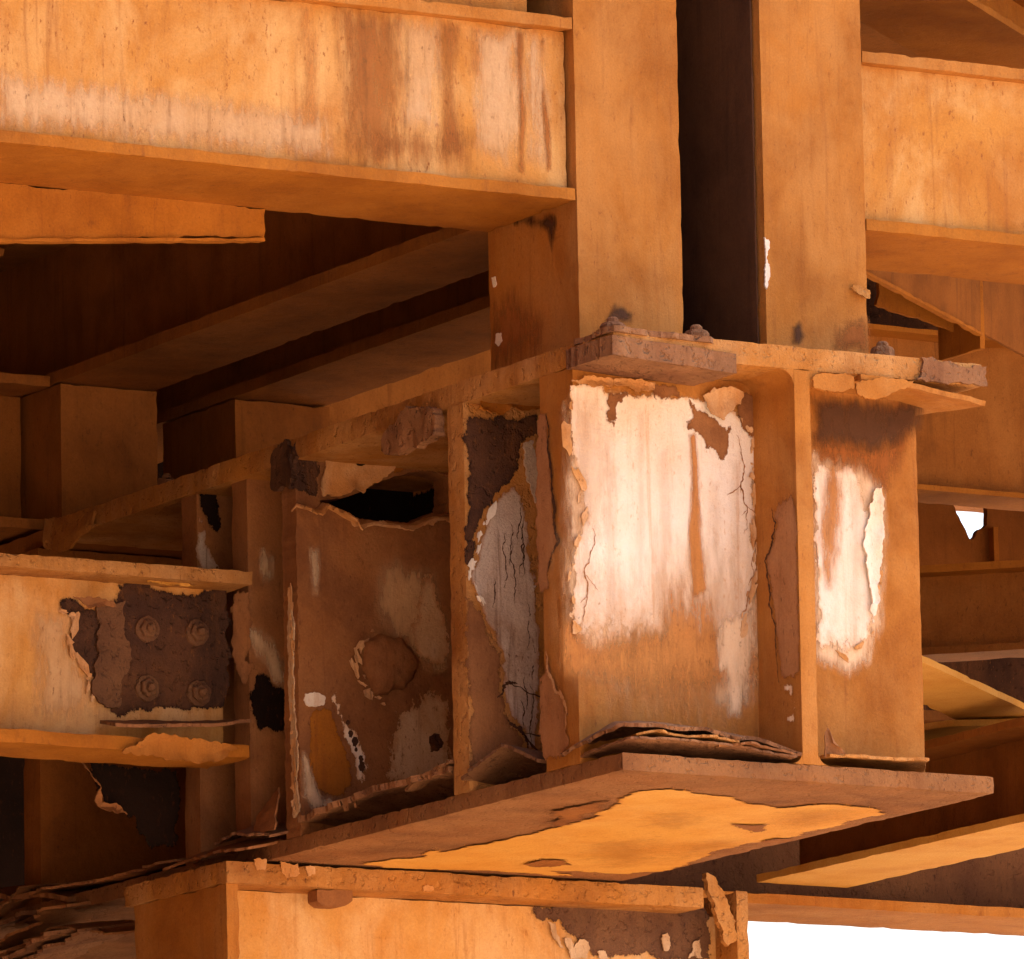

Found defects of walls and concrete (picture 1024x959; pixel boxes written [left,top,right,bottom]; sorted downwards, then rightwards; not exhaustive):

rust [345,13,430,157]
rust [444,26,463,156]
rust [543,99,551,169]
crack [729,437,755,530]
peeling [812,450,885,670]
peeling [0,325,802,959]
crack [497,680,541,751]